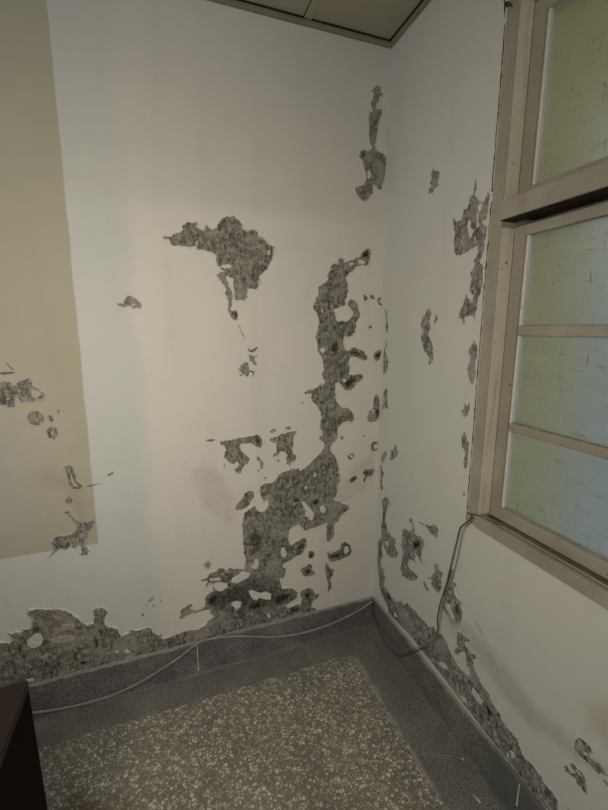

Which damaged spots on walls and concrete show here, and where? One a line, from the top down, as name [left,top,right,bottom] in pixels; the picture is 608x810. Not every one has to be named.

spalling [353,84,387,203]
spalling [162,214,275,336]
peeling [452,175,493,325]
peeling [420,307,439,366]
spalling [0,248,383,687]
peeling [460,430,471,471]
spalling [377,495,560,810]
peeling [563,733,608,797]